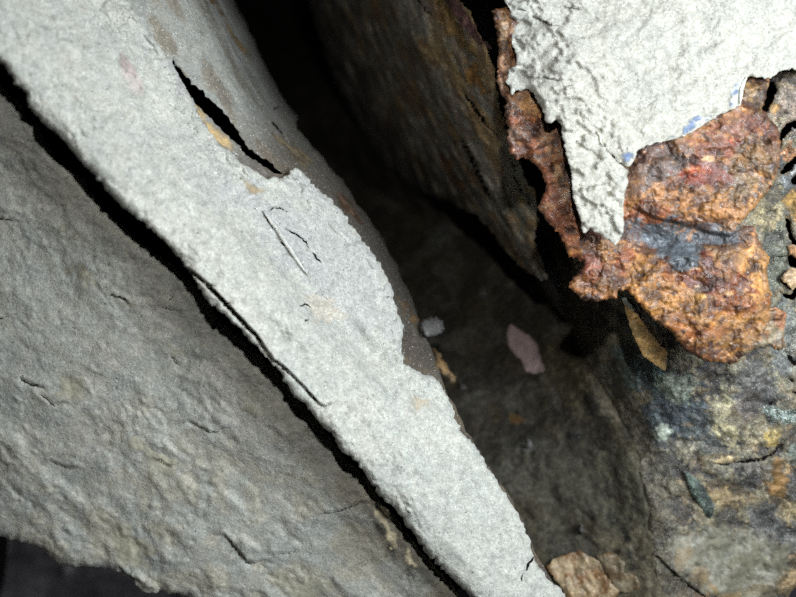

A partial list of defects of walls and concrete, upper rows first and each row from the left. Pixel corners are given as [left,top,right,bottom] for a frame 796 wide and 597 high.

peeling [730,76,747,107]
peeling [683,116,712,134]
rust [430,0,796,371]
peeling [263,211,308,275]
crack [0,61,461,591]
rust [436,352,455,382]
rust [546,550,640,597]